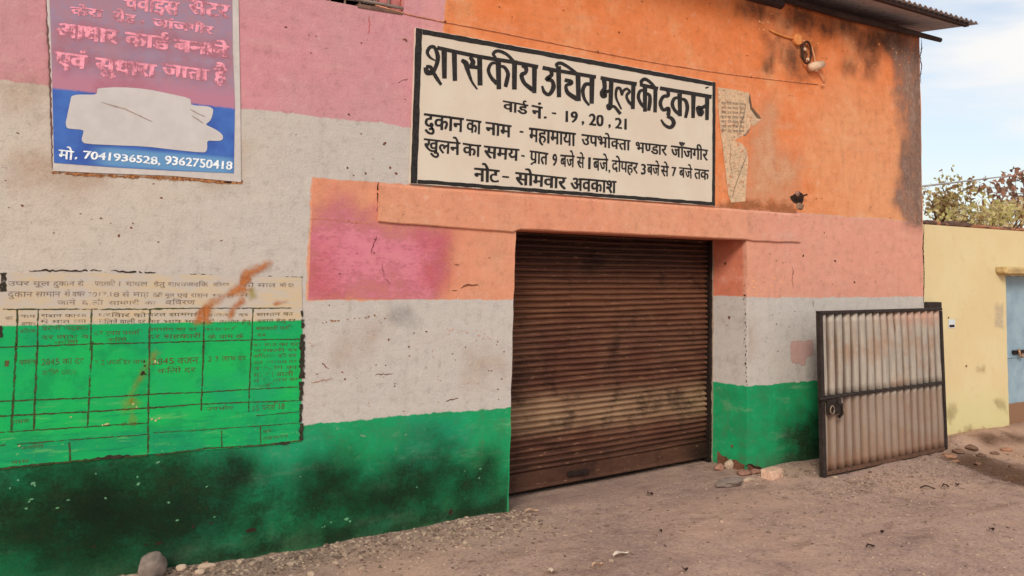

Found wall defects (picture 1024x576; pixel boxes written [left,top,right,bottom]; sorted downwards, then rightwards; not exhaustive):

damp [789,7,922,224]
damp [0,456,281,565]
damp [289,459,507,544]